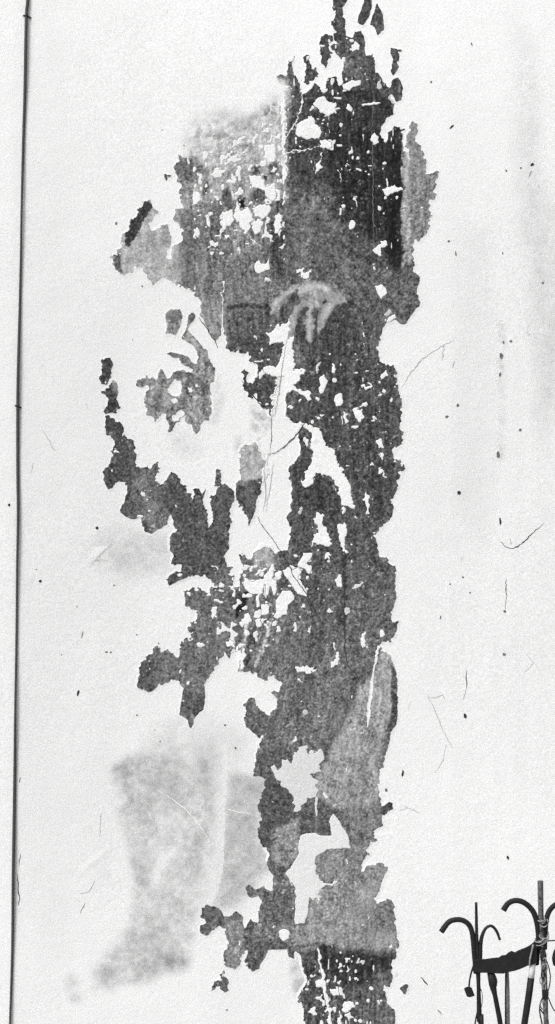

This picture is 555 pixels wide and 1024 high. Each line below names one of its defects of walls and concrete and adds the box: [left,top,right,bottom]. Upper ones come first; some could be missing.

peeling [97,0,441,1024]
crack [402,341,454,387]